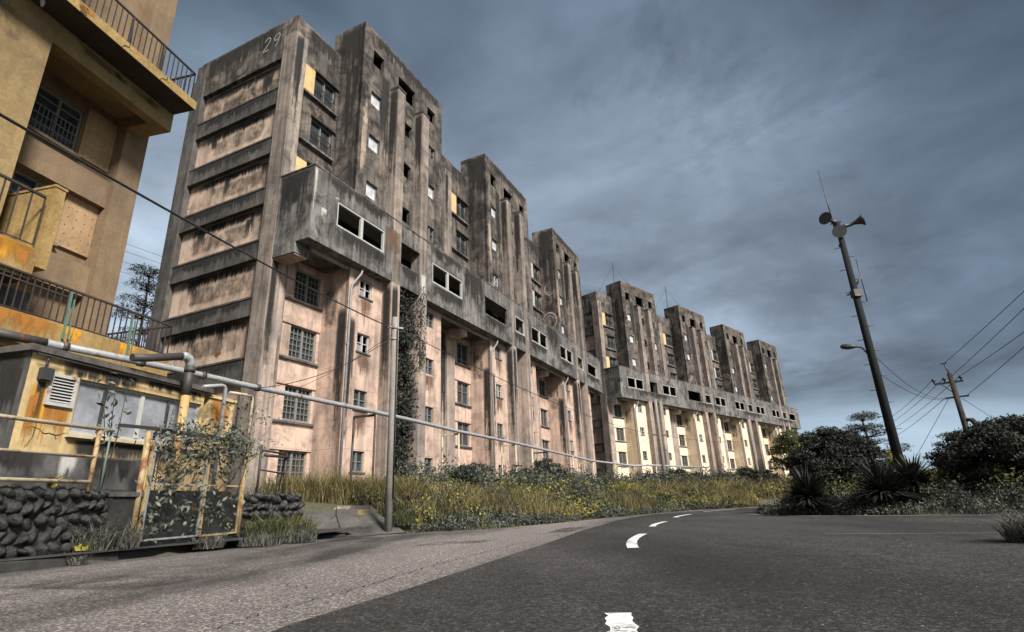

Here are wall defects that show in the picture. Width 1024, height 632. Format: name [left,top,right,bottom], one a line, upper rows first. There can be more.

water stain [379,38,433,100]
water stain [380,77,397,175]
corrosion [0,235,29,265]
water stain [172,68,275,375]
water stain [331,177,398,264]
corrosion [22,386,68,434]
corrosion [62,326,82,344]
water stain [264,260,279,376]
water stain [326,293,355,435]
water stain [381,288,398,384]